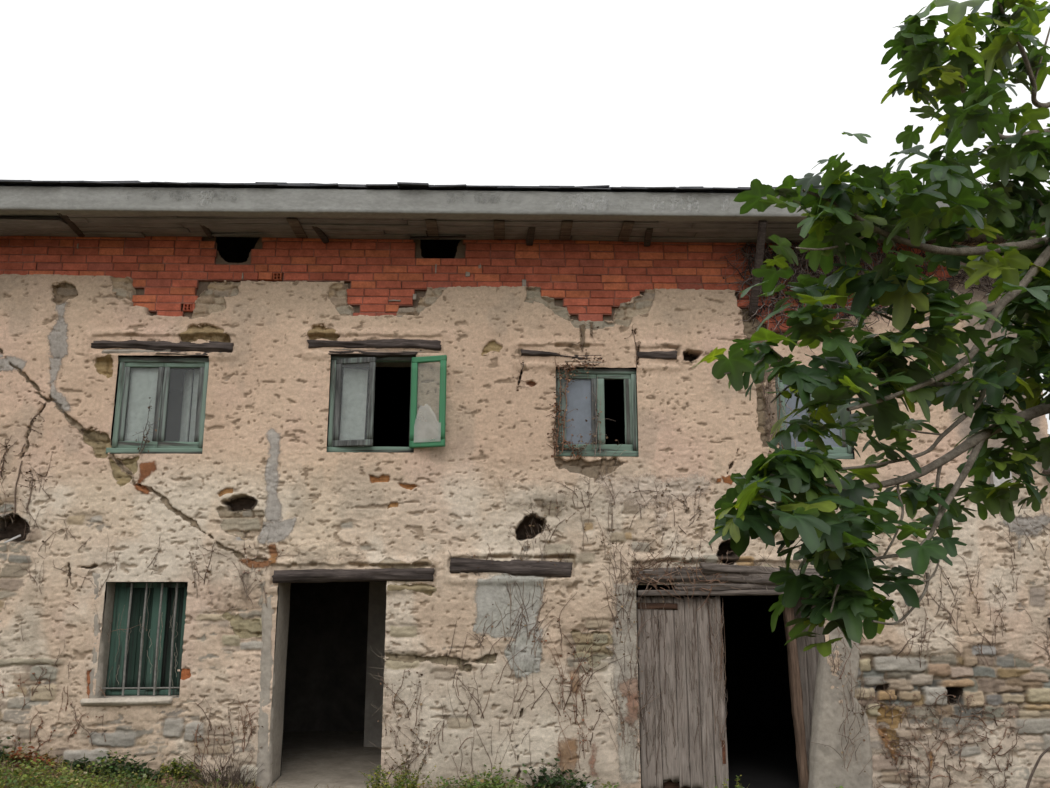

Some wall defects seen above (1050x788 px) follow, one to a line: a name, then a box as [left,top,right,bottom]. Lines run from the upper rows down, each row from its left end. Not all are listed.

spalling [179,280,240,342]
spalling [307,324,340,340]
spalling [328,281,354,316]
spalling [396,287,447,317]
spalling [525,287,655,330]
crack [0,349,83,459]
crack [113,457,267,563]
spalling [876,684,903,749]
spalling [946,687,963,704]